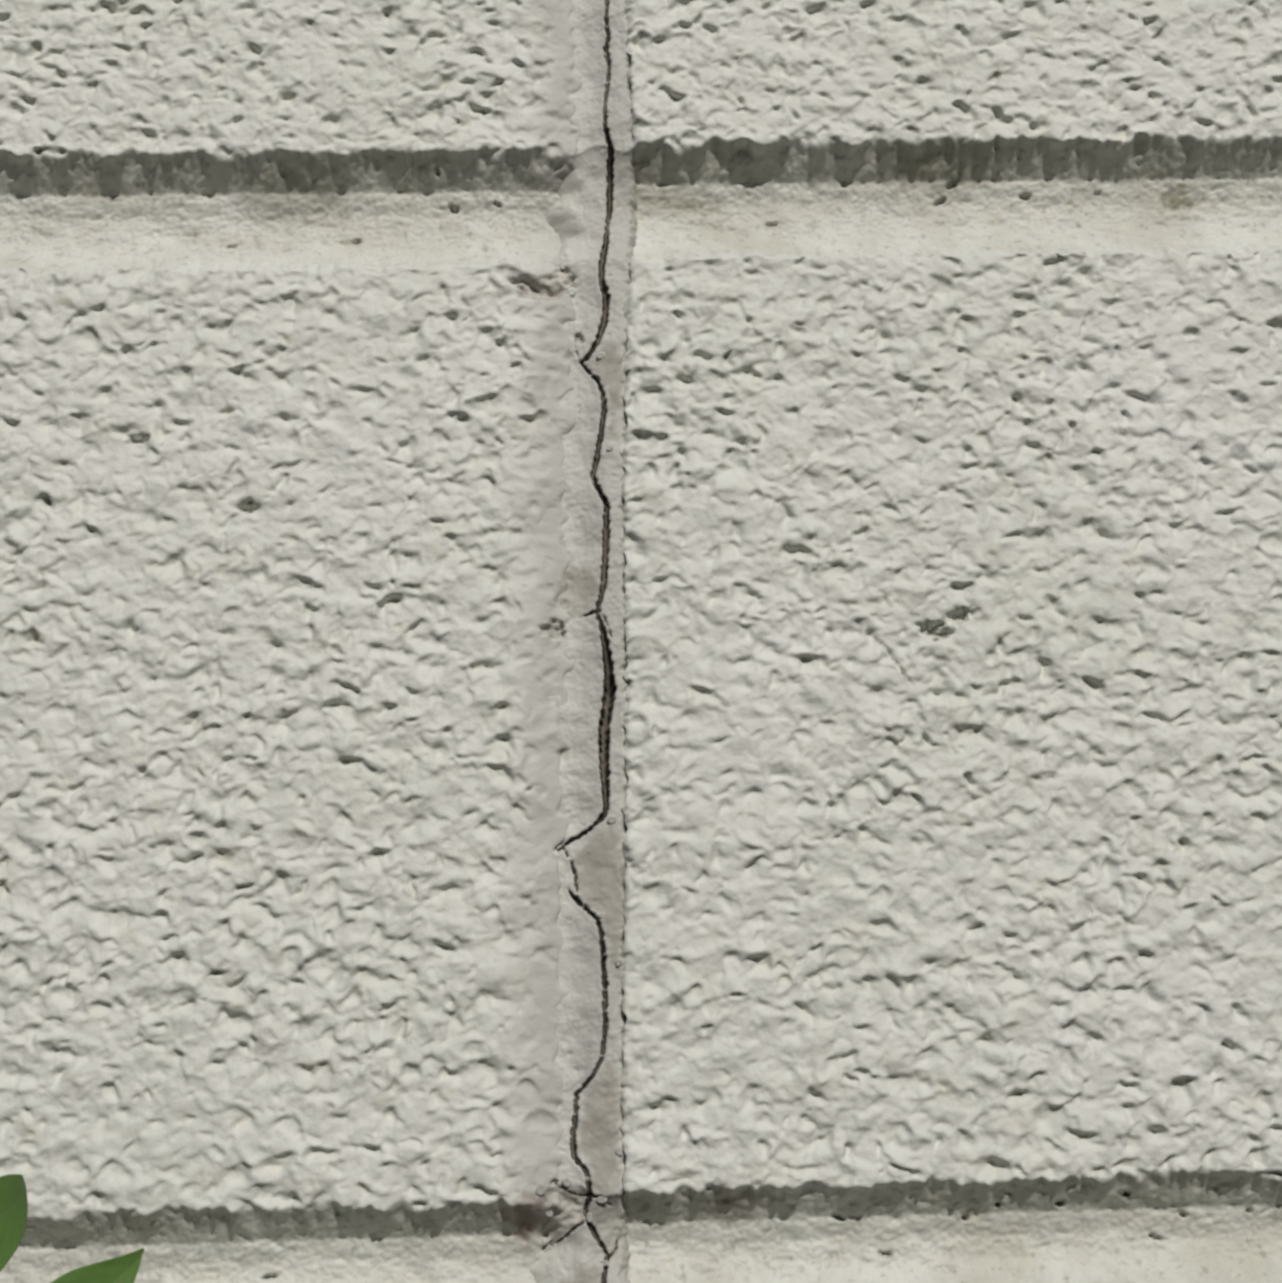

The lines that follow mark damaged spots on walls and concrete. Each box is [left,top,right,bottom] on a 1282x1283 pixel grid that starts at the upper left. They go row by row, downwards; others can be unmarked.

crack [551,0,621,1283]